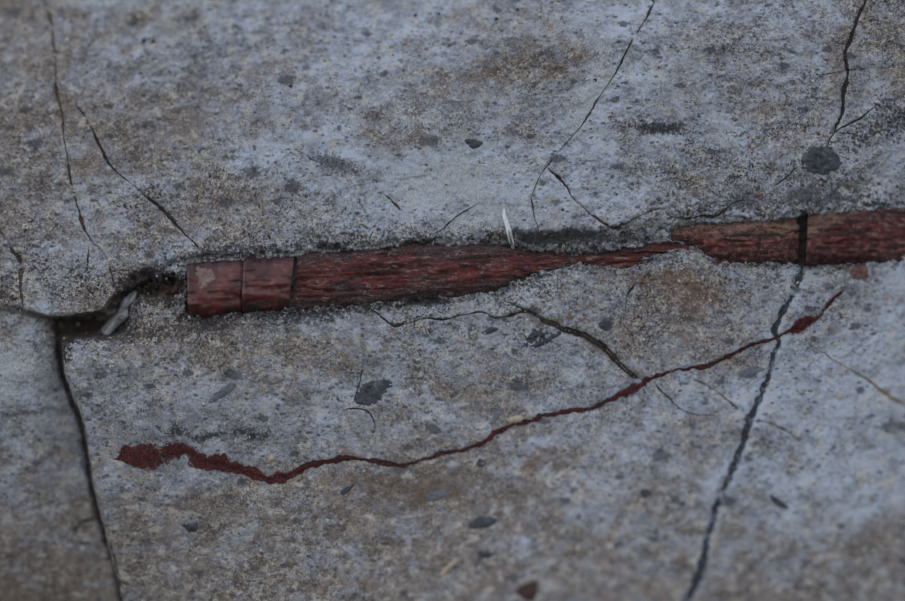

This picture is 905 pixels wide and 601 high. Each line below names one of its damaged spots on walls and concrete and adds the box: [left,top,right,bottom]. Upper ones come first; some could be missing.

crack [42,0,200,296]
crack [531,0,761,230]
crack [820,0,874,147]
crack [0,228,24,306]
crack [54,318,123,601]
spalling [36,272,186,362]
crack [341,362,376,429]
crack [297,429,497,468]
crack [360,301,800,442]
spalling [598,317,613,331]